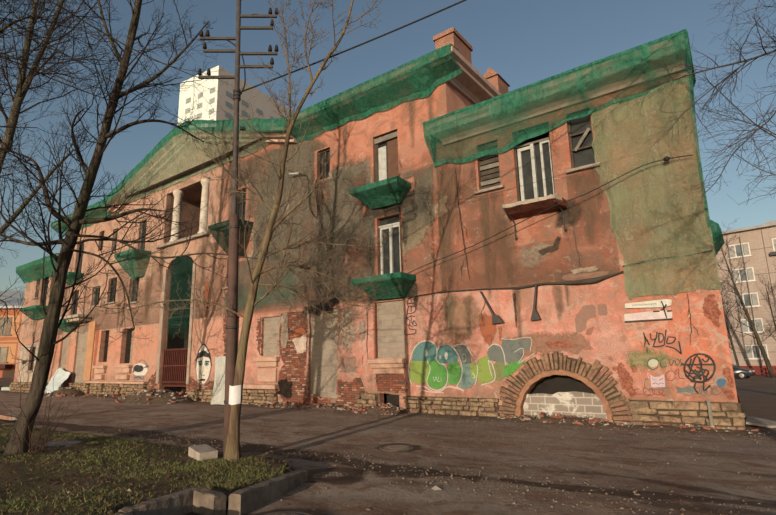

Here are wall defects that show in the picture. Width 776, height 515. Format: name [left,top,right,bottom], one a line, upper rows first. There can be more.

flaking render [519,237,571,268]
flaking render [248,140,407,409]
spalling [702,294,721,328]
rust [479,315,502,346]
spalling [608,356,637,400]